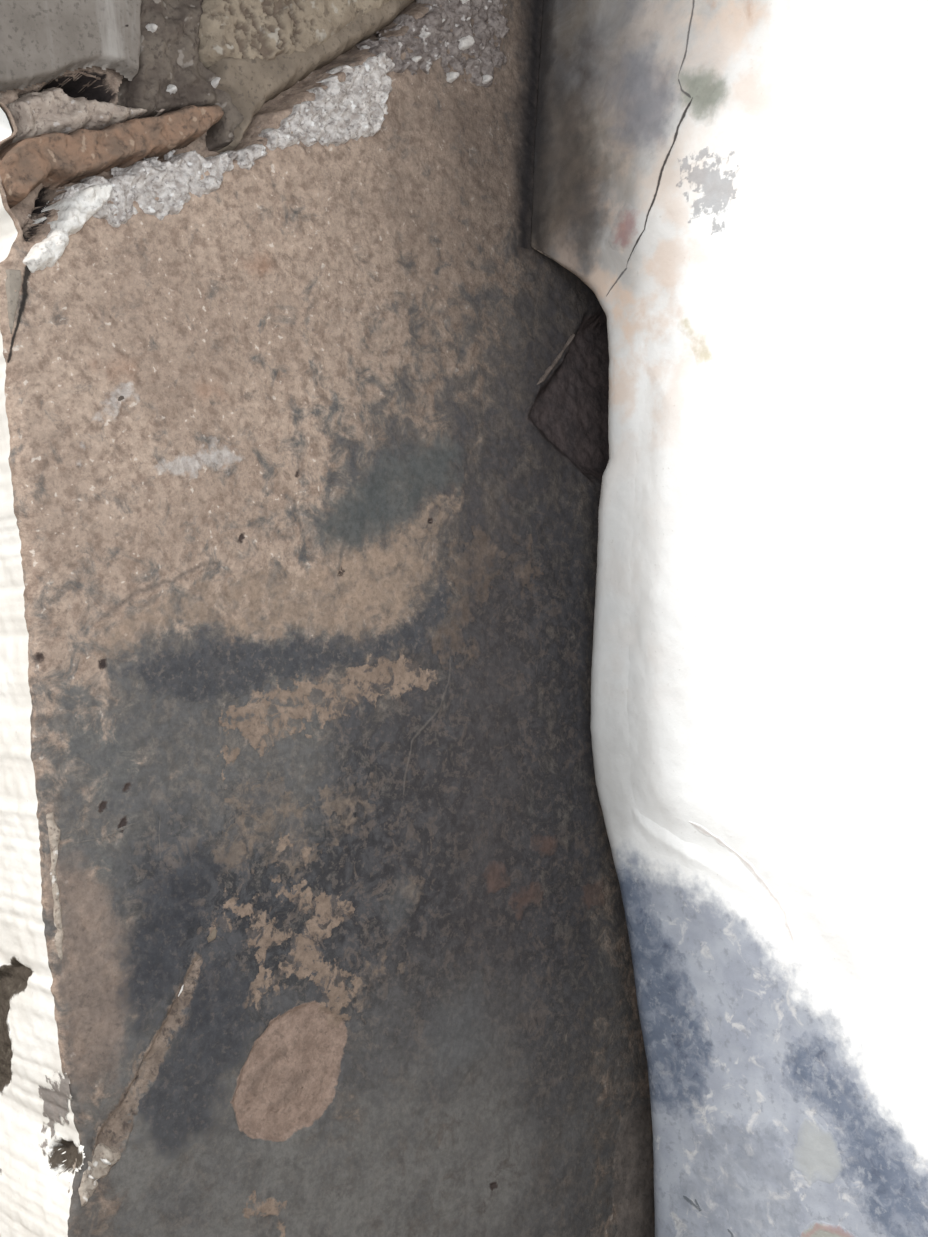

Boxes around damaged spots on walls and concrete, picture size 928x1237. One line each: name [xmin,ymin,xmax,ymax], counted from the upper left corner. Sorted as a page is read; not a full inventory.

spalling [47,0,510,228]
crack [606,0,696,297]
peeling [5,269,22,334]
damp [92,381,142,424]
efflorescence [150,435,246,482]
damp [312,427,470,571]
damp [118,570,456,705]
peeling [38,649,439,1207]
damp [372,869,426,945]
spalling [0,956,33,1096]